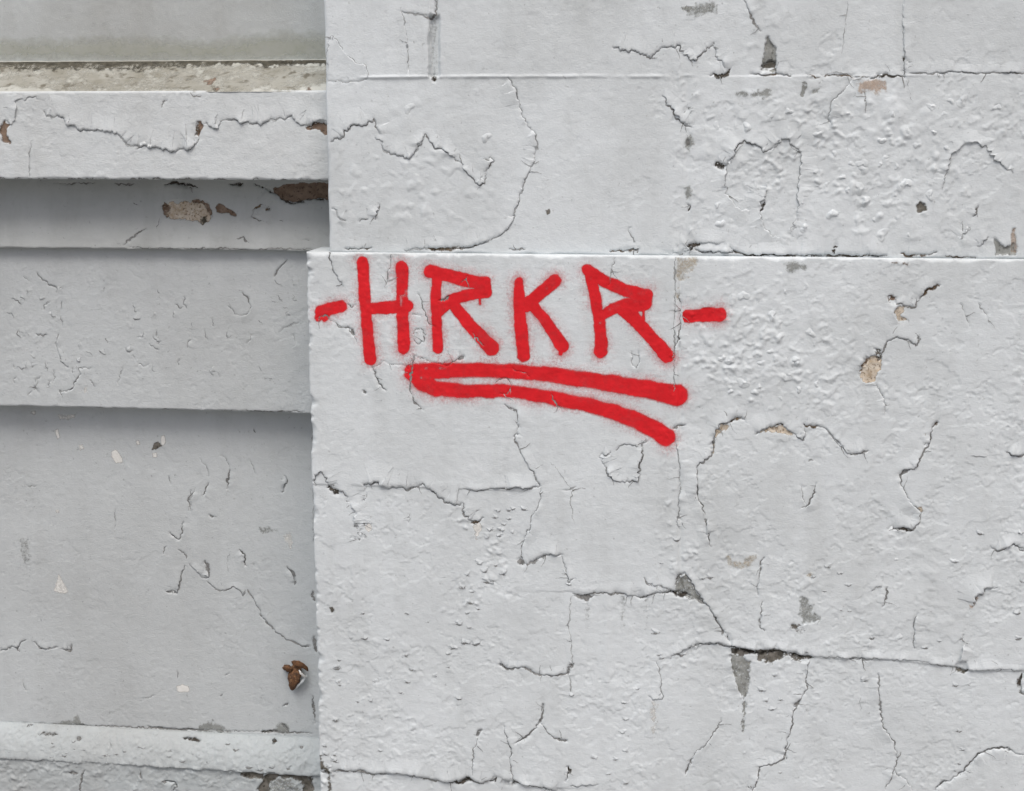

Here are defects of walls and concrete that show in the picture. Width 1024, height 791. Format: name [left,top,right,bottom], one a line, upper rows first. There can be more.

peeling [613,27,791,83]
spalling [157,190,237,225]
spalling [248,182,380,222]
crack [382,77,541,284]
crack [671,258,690,390]
spalling [850,341,882,383]
crack [870,275,941,357]
crack [161,460,317,652]
spalling [676,573,714,600]
crack [464,368,1024,791]
peeling [724,648,812,732]